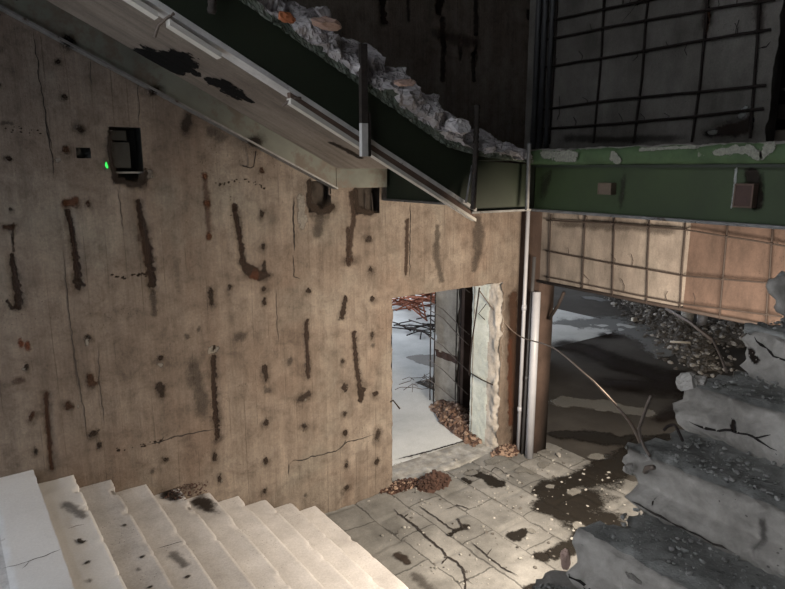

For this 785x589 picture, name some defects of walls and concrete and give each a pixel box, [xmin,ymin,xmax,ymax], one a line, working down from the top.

peeling [133,44,255,103]
spalling [705,106,776,161]
spalling [328,142,363,159]
spalling [465,105,480,210]
peeling [540,149,578,162]
peeling [609,151,622,164]
spalling [748,348,760,364]
crack [754,337,785,361]
crack [690,421,777,451]
damp [461,469,506,488]
damp [531,429,671,562]
damp [506,528,528,541]